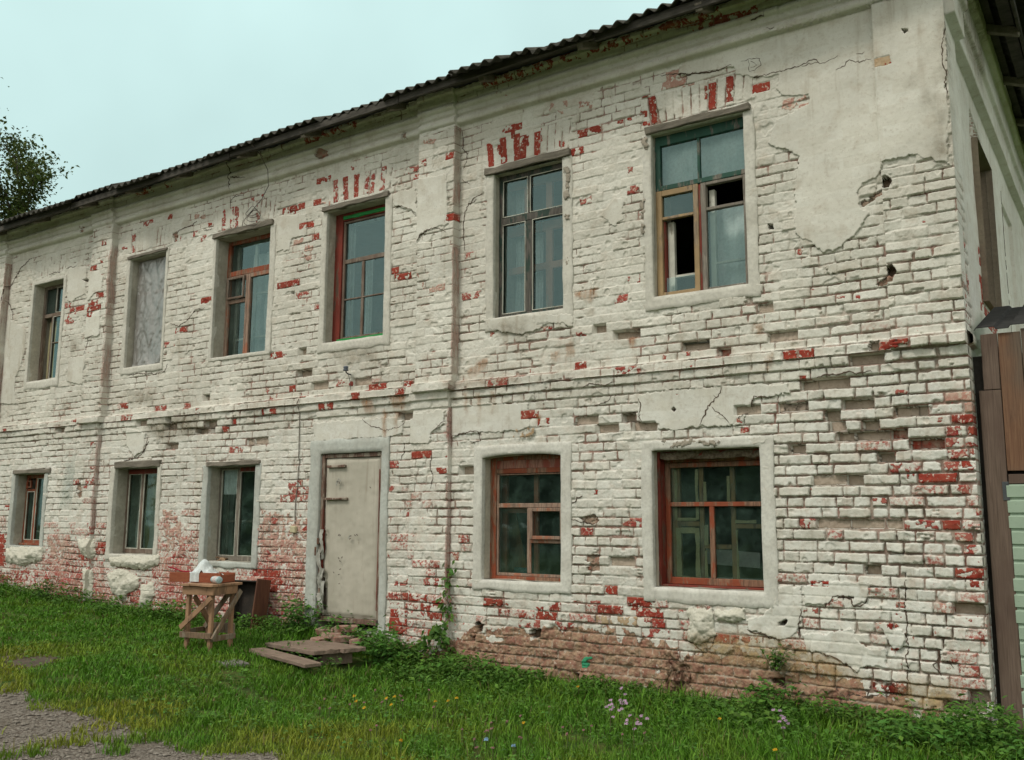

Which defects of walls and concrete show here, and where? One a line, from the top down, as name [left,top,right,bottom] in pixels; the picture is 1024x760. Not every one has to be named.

crack [663,52,870,78]
peeling [487,100,593,167]
crack [397,138,481,255]
spalling [769,331,814,360]
spalling [851,338,908,366]
crack [700,390,772,424]
flaking render [576,376,978,495]
peeling [0,528,55,594]
peeling [252,480,309,625]
spalling [800,518,977,555]
crack [826,595,868,607]
spalling [422,565,991,725]